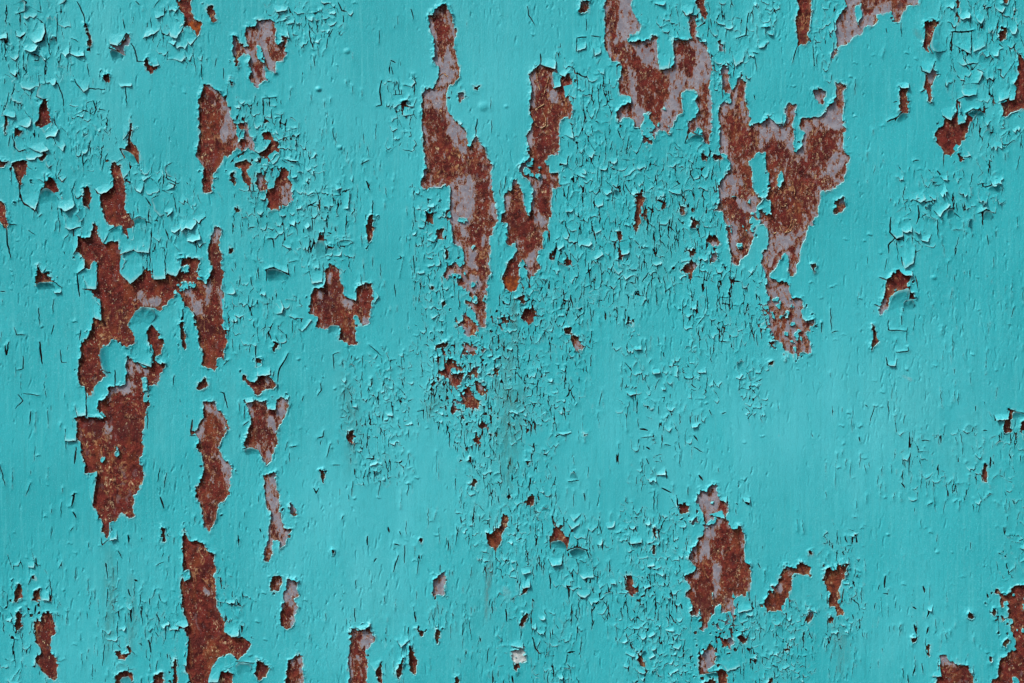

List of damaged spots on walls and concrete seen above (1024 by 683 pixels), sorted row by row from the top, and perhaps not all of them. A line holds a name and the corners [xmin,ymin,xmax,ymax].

peeling [0,0,379,562]
crack [248,160,374,377]
crack [576,274,648,325]
peeling [341,0,919,683]
crack [639,207,678,249]
crack [682,246,753,324]
crack [886,316,915,367]
crack [879,160,990,278]
crack [616,379,762,480]
crack [859,401,942,488]